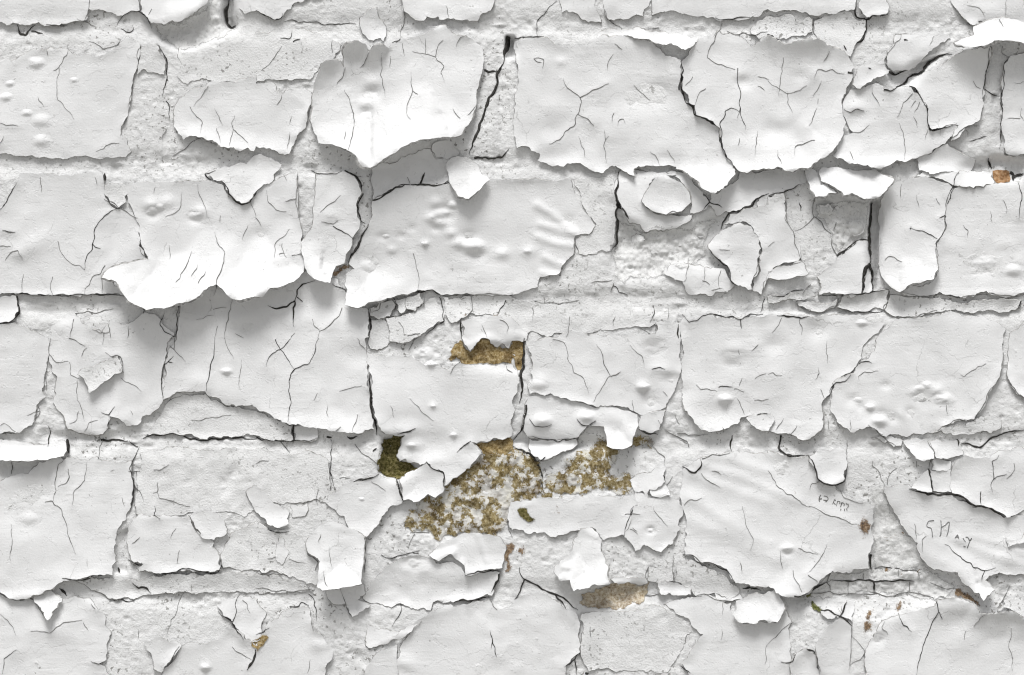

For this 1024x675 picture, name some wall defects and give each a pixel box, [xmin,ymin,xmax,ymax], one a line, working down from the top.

crack [1,0,466,674]
peeling [0,154,525,675]
crack [358,254,620,488]
peeling [140,0,885,462]
crack [453,2,681,251]
peeling [507,0,1024,675]
crack [630,184,1023,524]
crack [681,0,1024,217]
crack [431,567,578,657]
peeling [364,593,692,675]
crack [645,554,761,639]
crack [780,526,991,669]